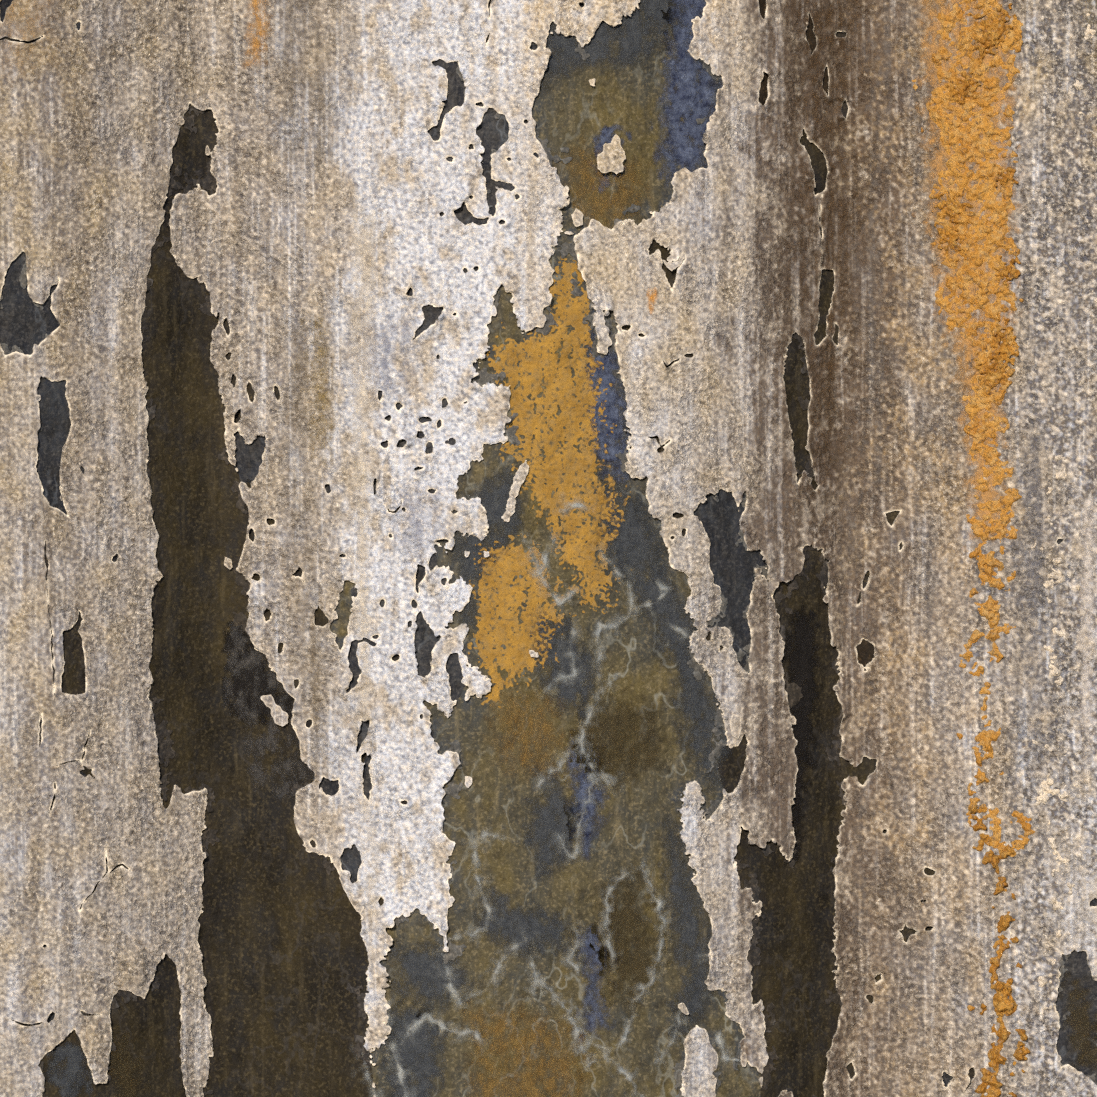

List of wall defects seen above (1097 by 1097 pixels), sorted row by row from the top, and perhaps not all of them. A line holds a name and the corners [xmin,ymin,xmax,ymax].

peeling [0,251,60,355]
peeling [35,376,71,515]
peeling [141,0,877,1097]
corrosion [921,0,1035,1097]
peeling [60,612,86,699]
peeling [38,954,187,1097]
peeling [1055,950,1097,1085]